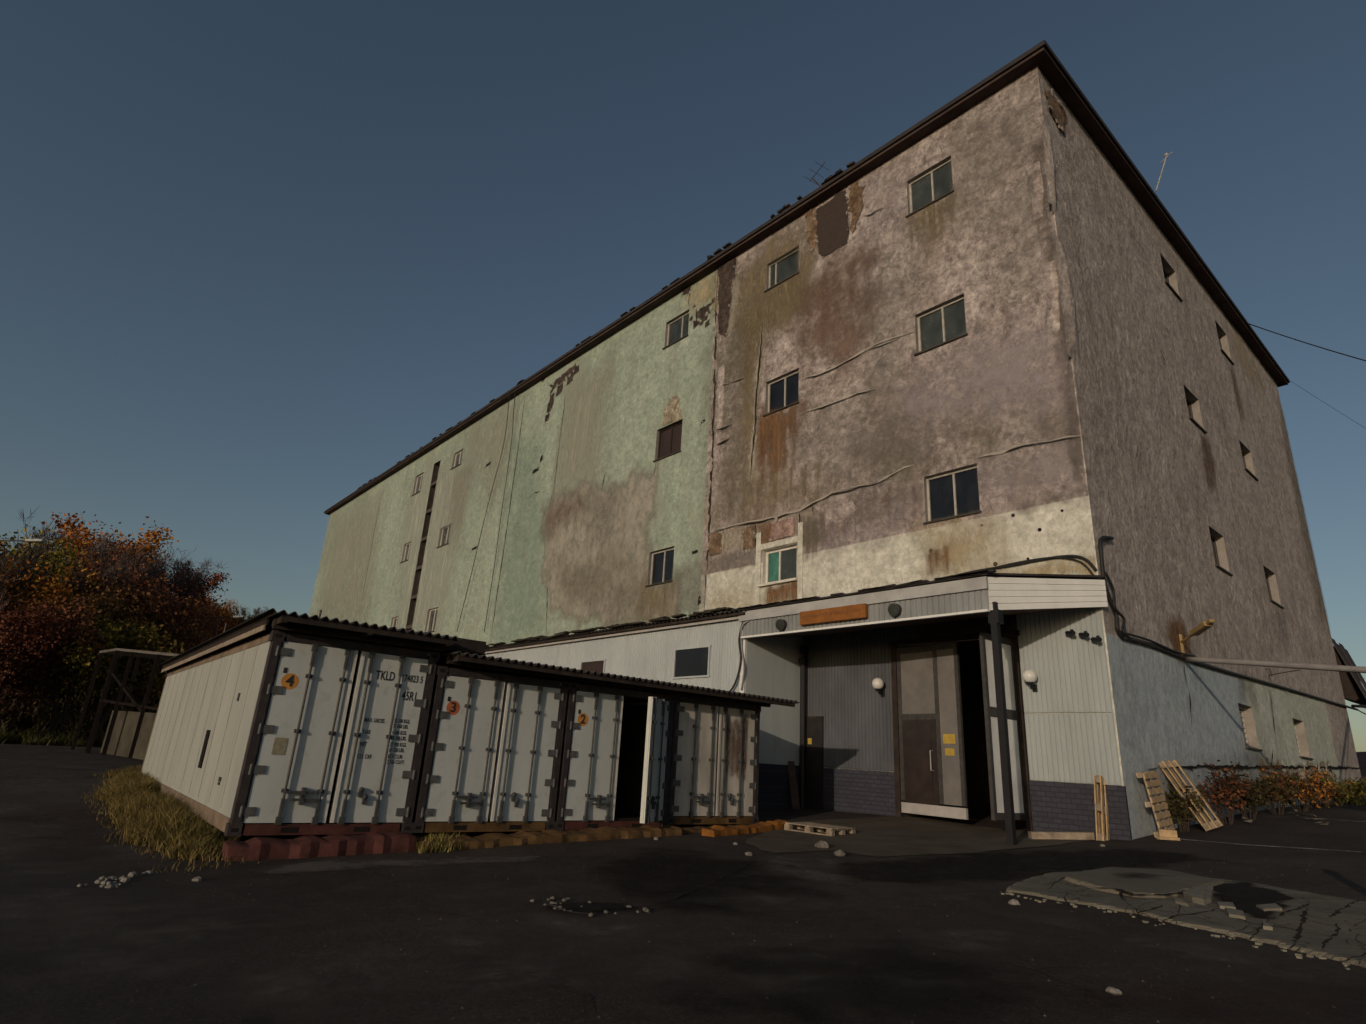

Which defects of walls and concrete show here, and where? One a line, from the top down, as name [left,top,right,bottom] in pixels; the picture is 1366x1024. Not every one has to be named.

spalling [804,181,865,258]
spalling [681,257,737,337]
spalling [542,363,579,423]
corrosion [757,407,820,503]
crack [688,276,913,607]
spalling [691,532,722,555]
crack [1046,877,1366,961]